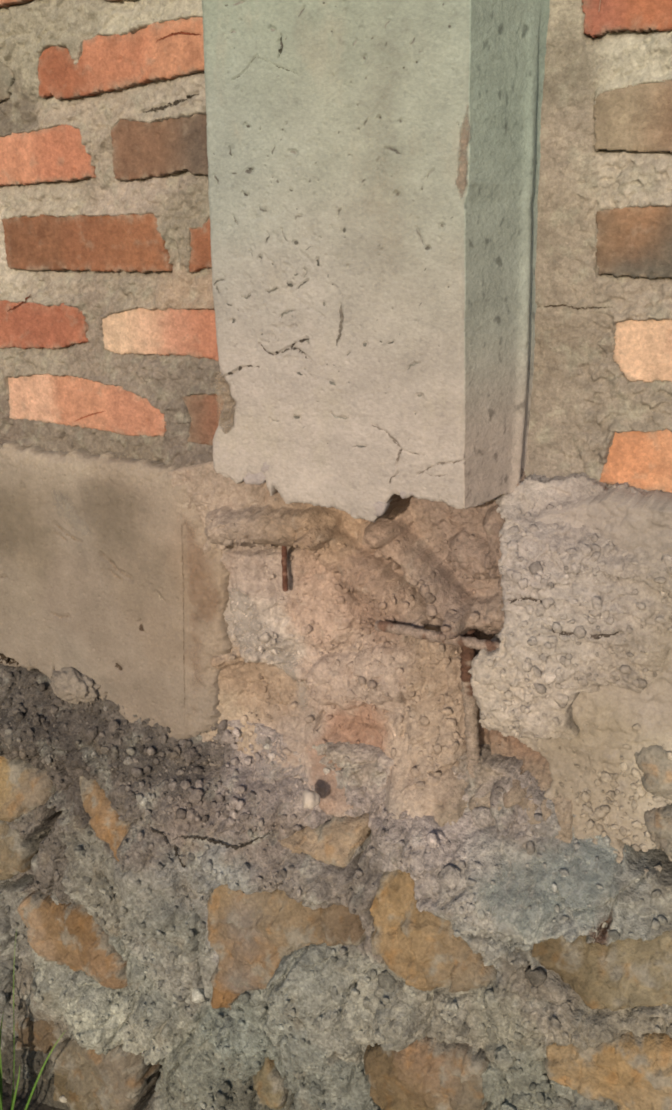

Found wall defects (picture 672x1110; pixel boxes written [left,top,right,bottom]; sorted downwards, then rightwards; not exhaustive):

crack [372,425,459,482]
spalling [168,461,672,843]